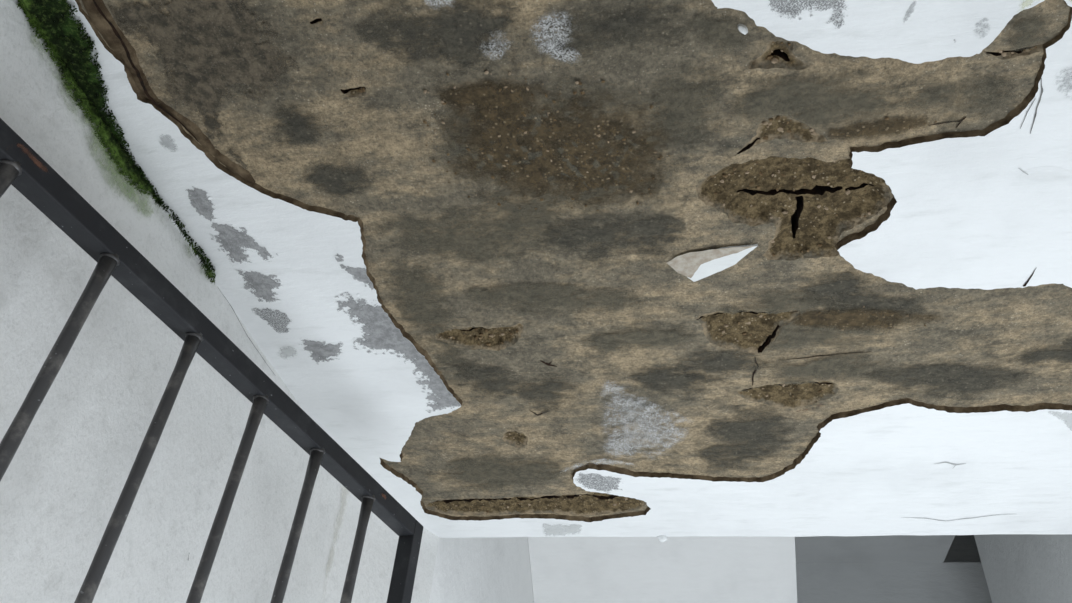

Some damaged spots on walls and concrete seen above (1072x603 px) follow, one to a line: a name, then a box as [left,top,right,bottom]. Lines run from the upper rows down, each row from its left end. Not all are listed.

peeling [769,0,847,28]
spalling [828,119,928,140]
water stain [306,164,372,197]
water stain [384,69,711,261]
flaking render [834,189,897,250]
peeling [186,187,291,333]
peeling [334,254,374,290]
peeling [298,339,343,364]
peeling [335,292,461,413]
crack [786,352,864,360]
water stain [450,273,1072,491]
peeling [575,471,621,492]